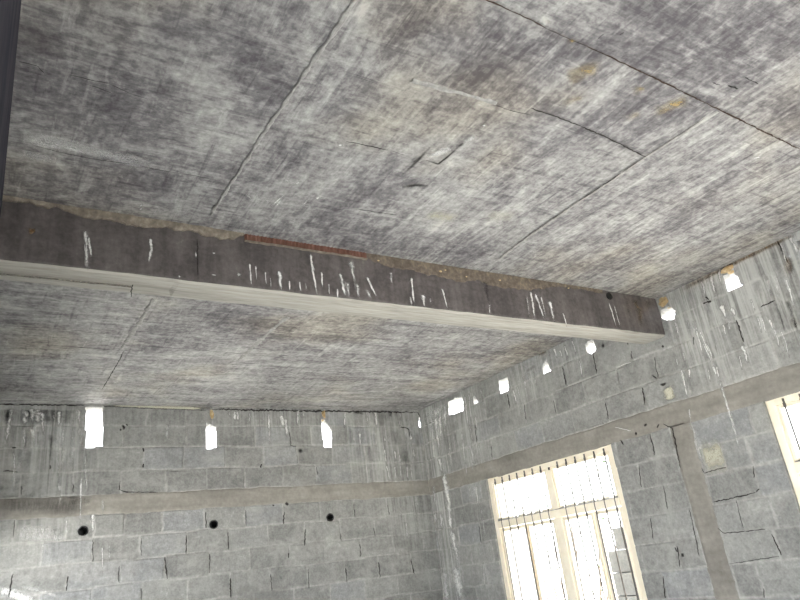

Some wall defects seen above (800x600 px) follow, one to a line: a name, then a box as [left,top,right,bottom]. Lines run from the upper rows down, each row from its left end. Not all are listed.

crack [486,0,800,257]
corrosion [244,234,368,260]
spalling [366,253,603,293]